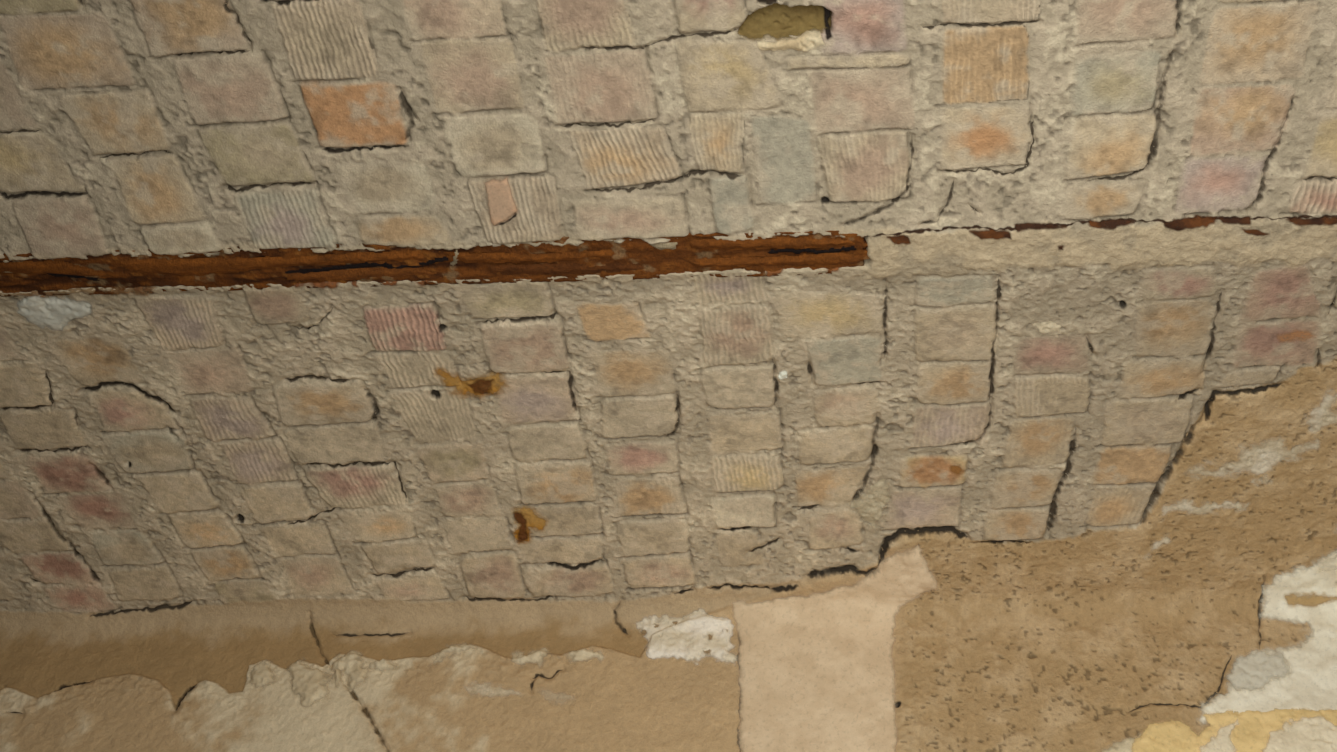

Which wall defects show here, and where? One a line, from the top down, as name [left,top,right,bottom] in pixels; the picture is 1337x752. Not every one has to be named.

spalling [757,29,825,52]
crack [845,99,1337,250]
rust [0,249,644,298]
rust [684,236,865,277]
rust [437,368,505,397]
crack [3,373,175,484]
crack [1143,383,1281,520]
rust [514,507,546,543]
crack [678,440,1076,594]
peeling [1285,593,1337,606]
peeling [1228,651,1290,690]
peeling [1132,709,1337,752]